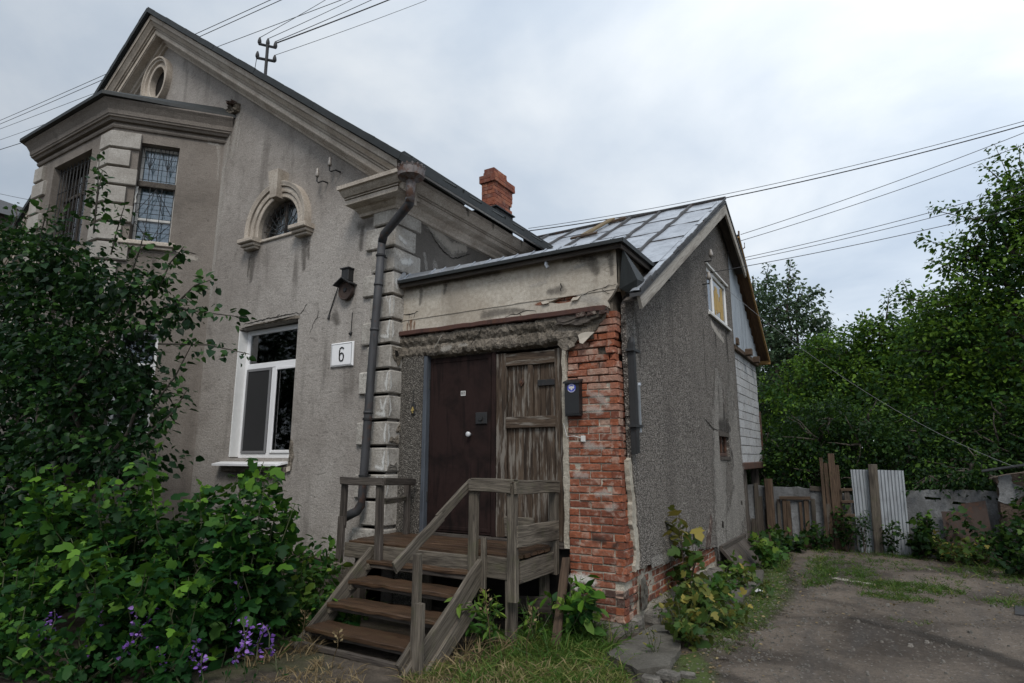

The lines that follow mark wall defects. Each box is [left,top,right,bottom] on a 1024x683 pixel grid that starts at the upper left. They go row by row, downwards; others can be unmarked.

spalling [541,295,609,348]